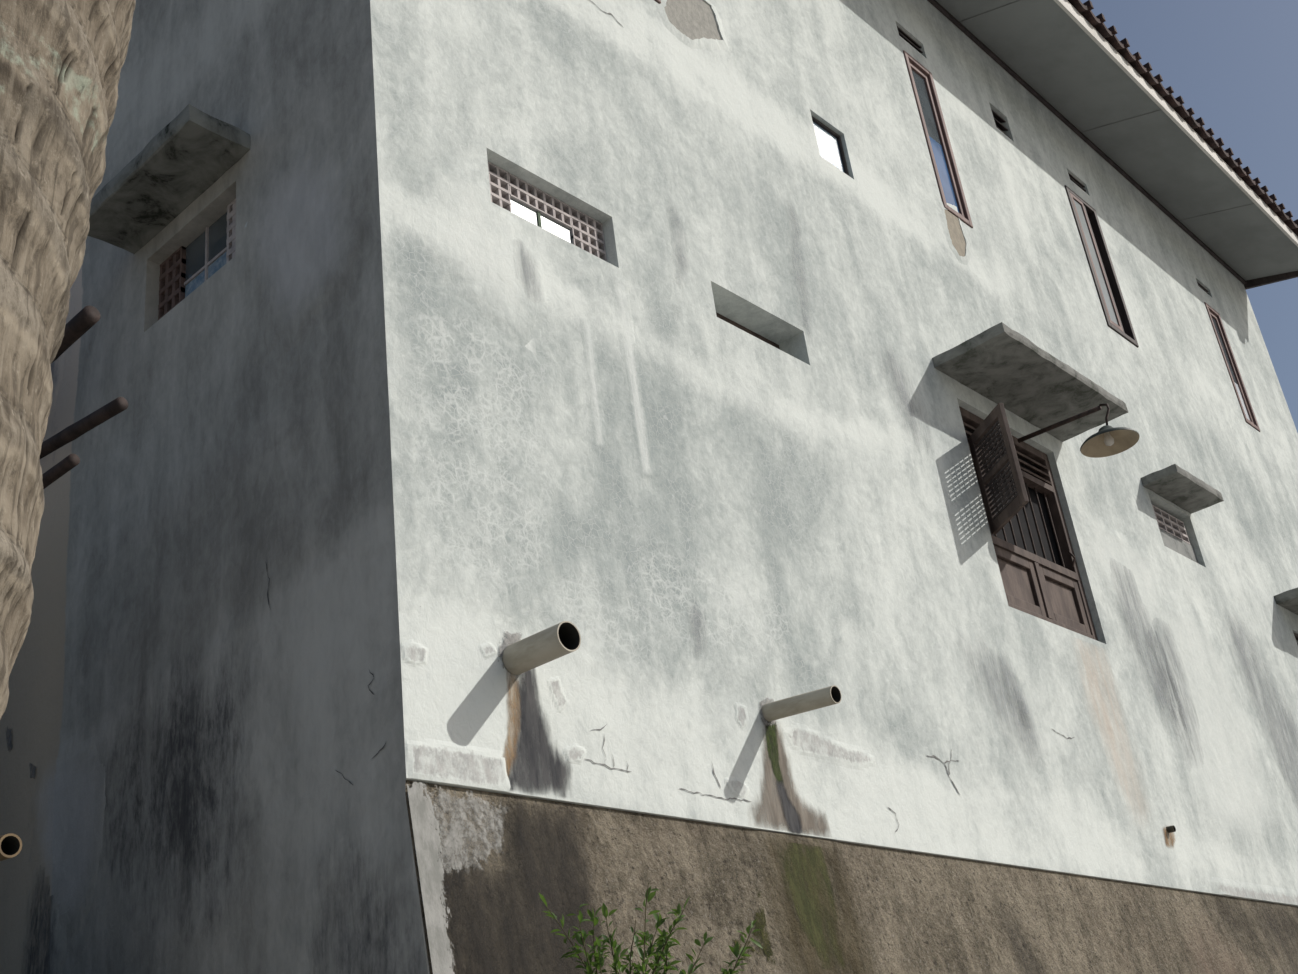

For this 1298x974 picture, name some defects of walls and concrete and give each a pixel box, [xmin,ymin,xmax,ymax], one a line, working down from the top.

flaking render [658,0,729,50]
flaking render [939,201,971,265]
crack [383,264,817,772]
damp [90,577,430,974]
damp [442,669,600,974]
crack [679,764,752,802]
damp [743,721,886,974]
crack [927,750,959,793]